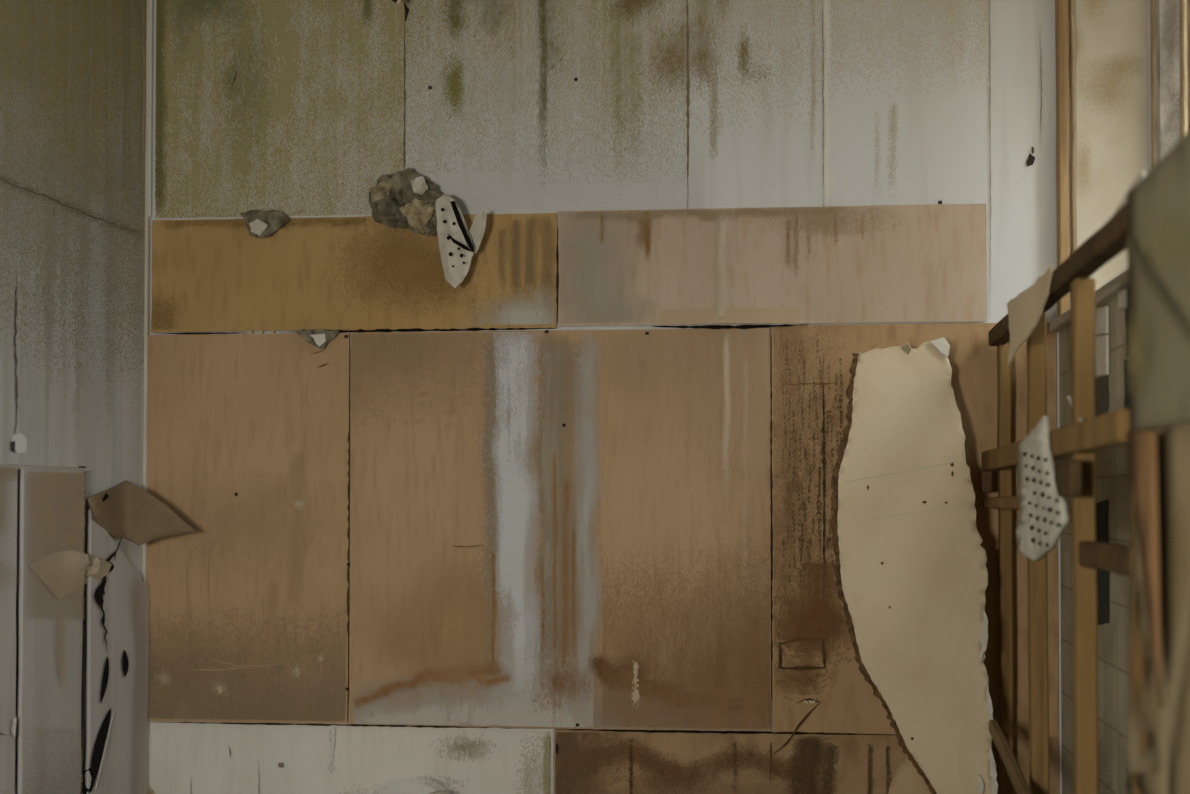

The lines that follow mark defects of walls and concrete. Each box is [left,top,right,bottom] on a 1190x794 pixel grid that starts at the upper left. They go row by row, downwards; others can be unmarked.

crack [0,0,145,233]
leakage [0,0,185,448]
leakage [95,0,989,794]
leakage [0,466,85,689]
peeling [88,481,196,545]
peeling [980,609,988,663]
peeling [978,745,998,794]
peeling [985,679,993,721]